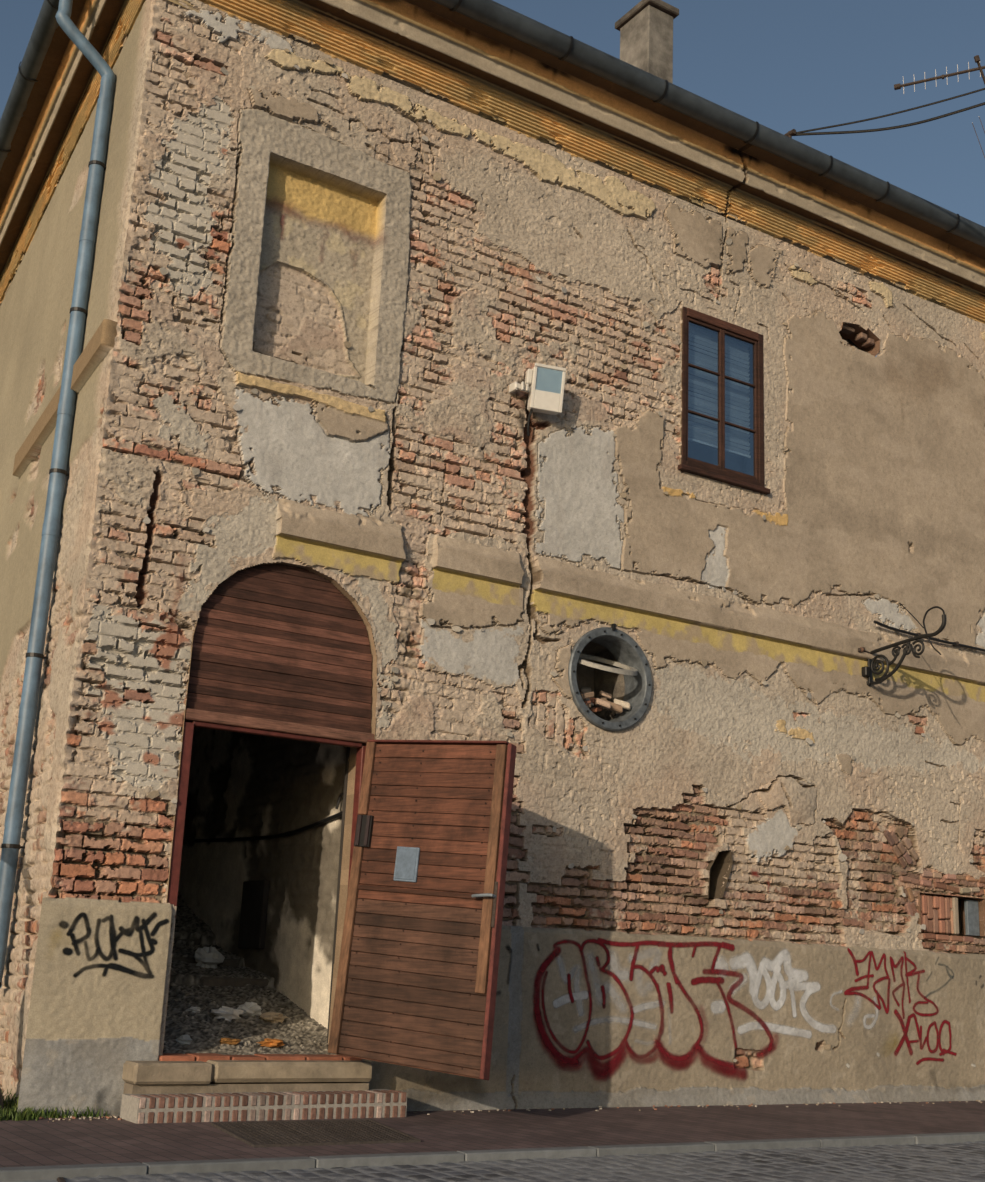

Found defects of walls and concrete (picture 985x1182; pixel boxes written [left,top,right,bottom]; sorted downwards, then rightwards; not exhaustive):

spalling [253,261,360,376]
peeling [186,9,728,304]
spalling [477,262,653,390]
crack [627,143,770,343]
crack [782,263,979,360]
spalling [92,509,217,574]
crack [134,469,194,630]
peeling [103,388,391,516]
crack [518,400,561,709]
peeling [274,533,985,745]
peeling [535,311,985,647]
spalling [501,644,985,954]